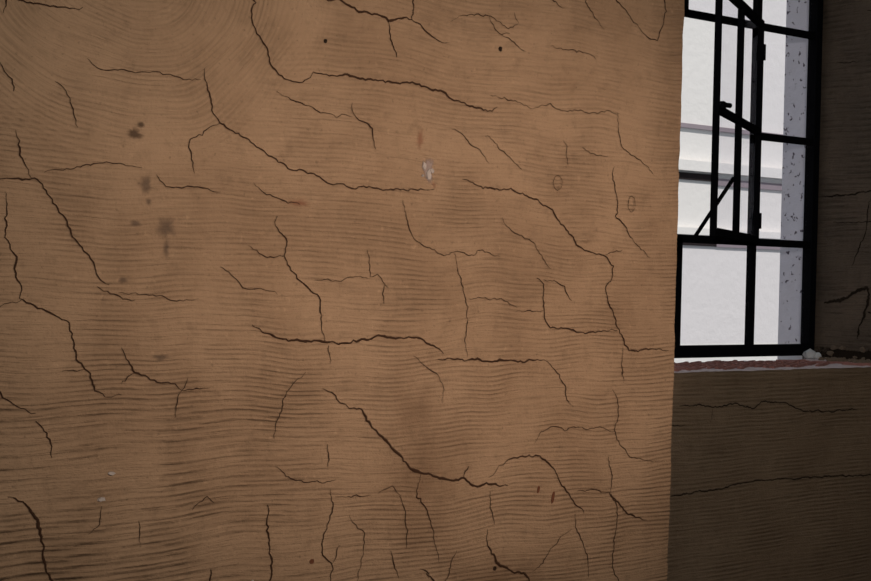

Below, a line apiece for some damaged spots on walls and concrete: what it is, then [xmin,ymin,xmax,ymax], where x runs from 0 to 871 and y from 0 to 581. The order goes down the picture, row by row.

crack [824,190,871,265]
crack [0,0,669,581]
crack [824,286,871,339]
crack [673,400,858,426]
crack [670,474,871,497]